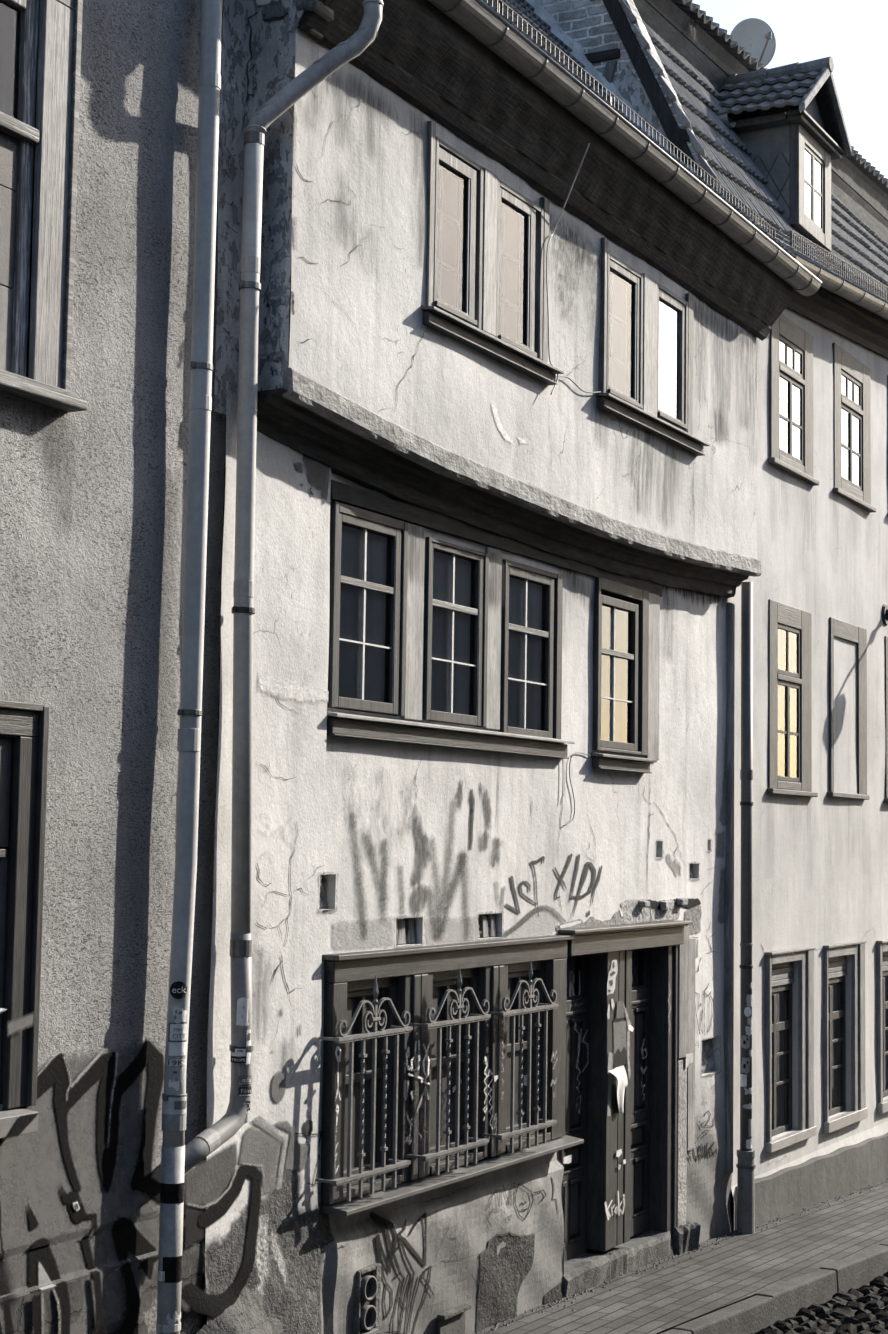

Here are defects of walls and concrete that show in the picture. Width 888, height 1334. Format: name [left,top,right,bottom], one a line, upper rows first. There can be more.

flaking render [262,0,289,22]
crack [294,77,399,335]
flaking render [294,454,329,505]
crack [257,822,323,1005]
flaking render [205,1166,331,1334]
flaking render [476,1231,535,1331]